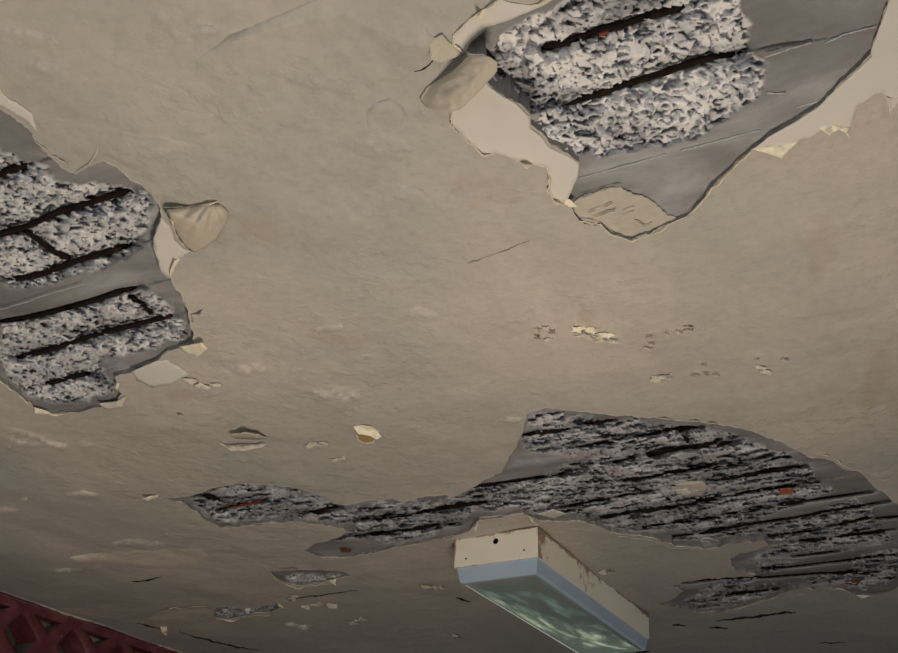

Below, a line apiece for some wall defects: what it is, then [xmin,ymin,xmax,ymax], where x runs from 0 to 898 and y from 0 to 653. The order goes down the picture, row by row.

spalling [420,0,898,242]
spalling [0,90,229,416]
spalling [143,408,898,617]
crack [137,623,260,650]
crack [710,611,796,629]